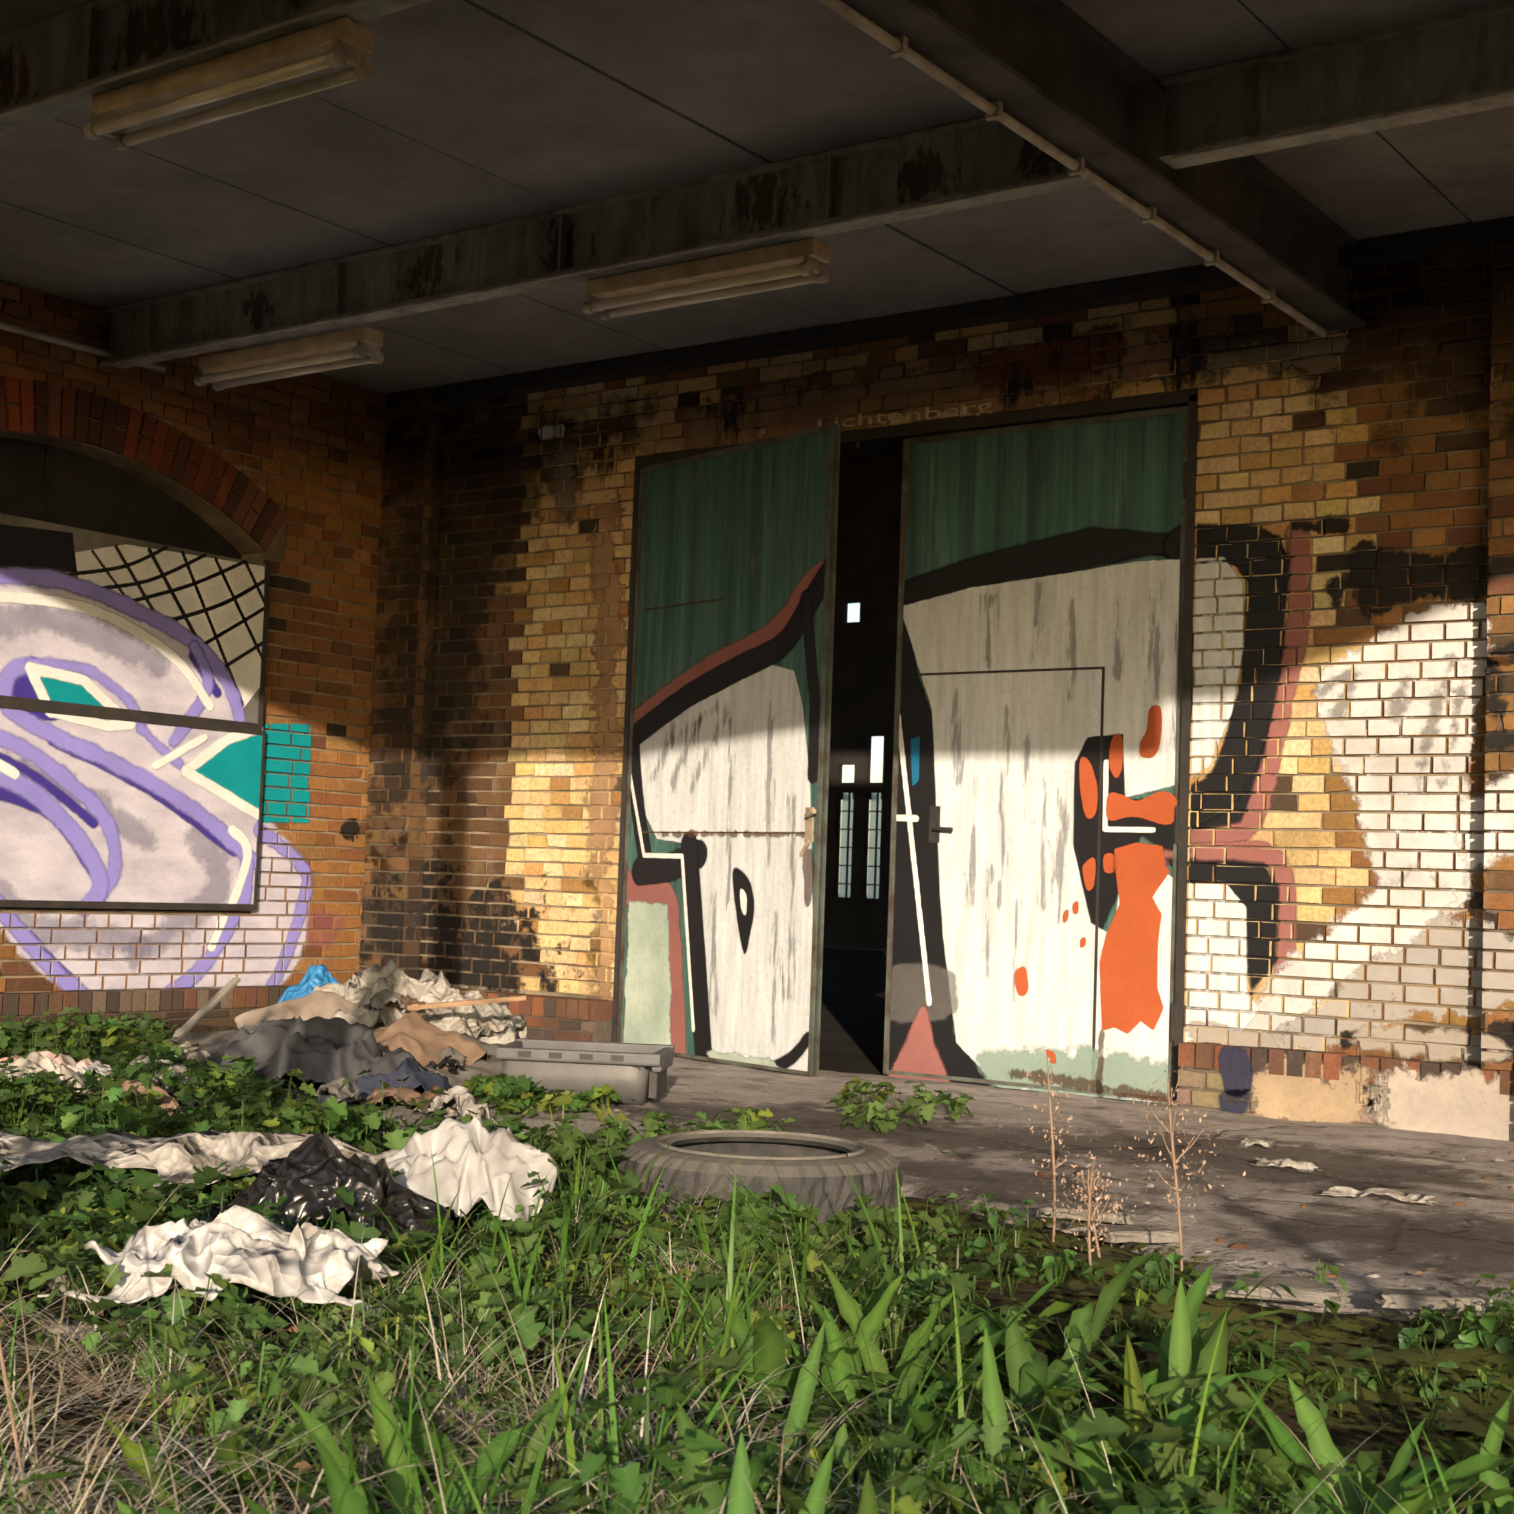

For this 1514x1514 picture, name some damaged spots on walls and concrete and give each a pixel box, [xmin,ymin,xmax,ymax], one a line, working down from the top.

corrosion [720,170,810,231]
corrosion [897,146,962,204]
corrosion [1016,140,1064,177]
flaking render [1246,1053,1514,1141]